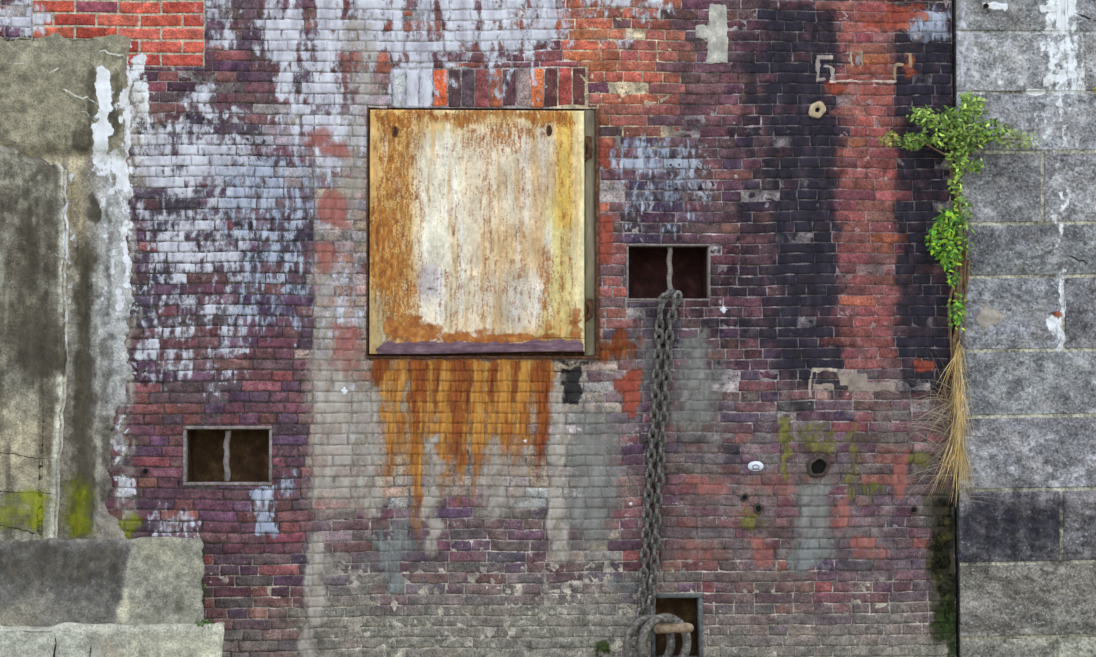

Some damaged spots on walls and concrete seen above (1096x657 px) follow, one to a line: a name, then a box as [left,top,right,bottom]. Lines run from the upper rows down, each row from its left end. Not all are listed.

damp [0,0,673,583]
corrosion [370,110,582,344]
corrosion [373,359,557,522]
damp [672,334,721,429]
damp [373,528,413,593]